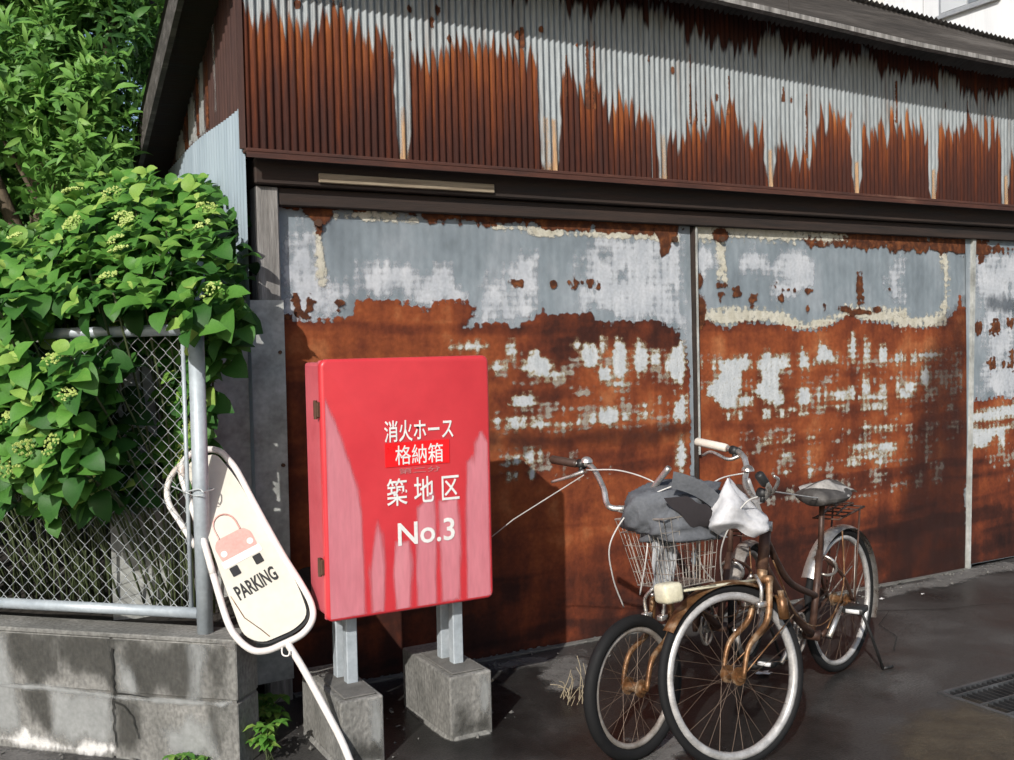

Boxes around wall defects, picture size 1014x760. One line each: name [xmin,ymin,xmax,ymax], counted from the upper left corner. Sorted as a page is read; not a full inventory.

rust [241,0,1014,205]
peeling [283,232,468,323]
peeling [492,225,687,328]
peeling [701,254,951,330]
peeling [493,394,653,431]
peeling [573,336,688,424]
rust [282,207,1014,659]
peeling [701,331,938,420]
peeling [970,252,1014,450]
rust [292,592,333,693]
rust [357,606,437,679]
water stain [0,633,225,756]